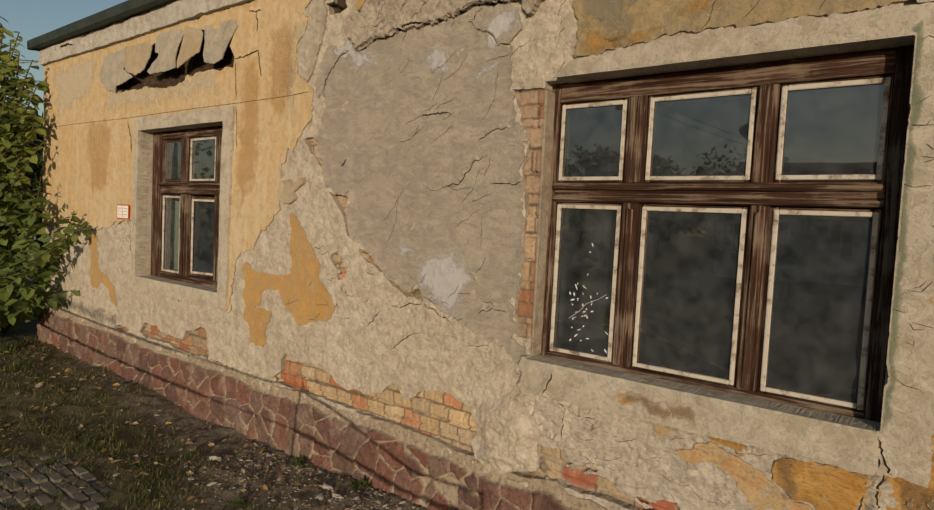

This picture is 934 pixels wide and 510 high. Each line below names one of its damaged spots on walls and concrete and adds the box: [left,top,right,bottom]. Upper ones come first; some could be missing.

crack [49,0,503,149]
flaking render [43,0,566,456]
crack [310,43,526,326]
crack [390,328,419,349]
flaking render [517,389,877,510]
crack [864,436,897,510]
flaking render [876,475,899,510]